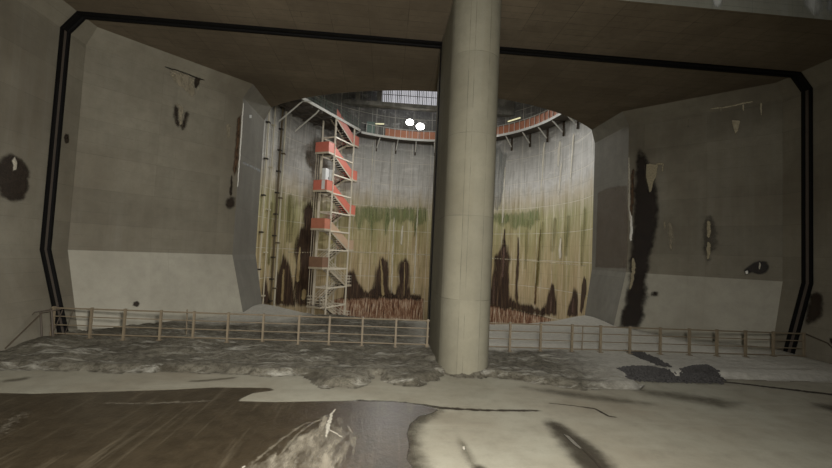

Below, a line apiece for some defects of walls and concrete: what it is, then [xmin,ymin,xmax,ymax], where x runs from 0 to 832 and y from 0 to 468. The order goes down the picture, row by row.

leakage [174,104,189,129]
leakage [0,155,29,201]
leakage [307,139,327,180]
leakage [262,192,322,306]
leakage [343,186,425,300]
leakage [490,150,556,317]
leakage [621,151,673,327]
spalling [745,261,769,274]
leakage [567,277,586,317]